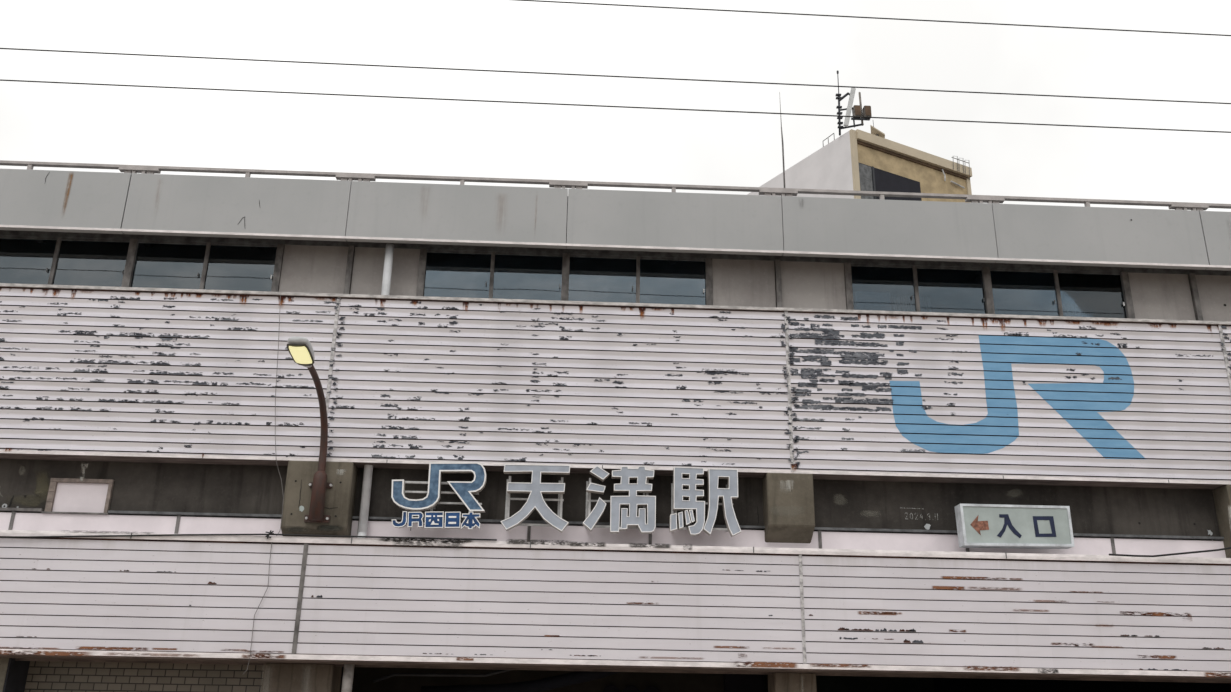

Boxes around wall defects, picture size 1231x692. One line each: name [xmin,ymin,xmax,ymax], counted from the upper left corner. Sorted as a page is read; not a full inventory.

peeling [517,308,605,340]
peeling [0,296,460,463]
peeling [526,353,569,406]
peeling [660,314,922,468]
peeling [935,320,972,415]
peeling [1048,326,1140,380]
peeling [437,382,506,459]
peeling [498,420,604,461]
rust [933,576,1021,590]
rust [0,646,177,656]
rust [222,649,284,658]